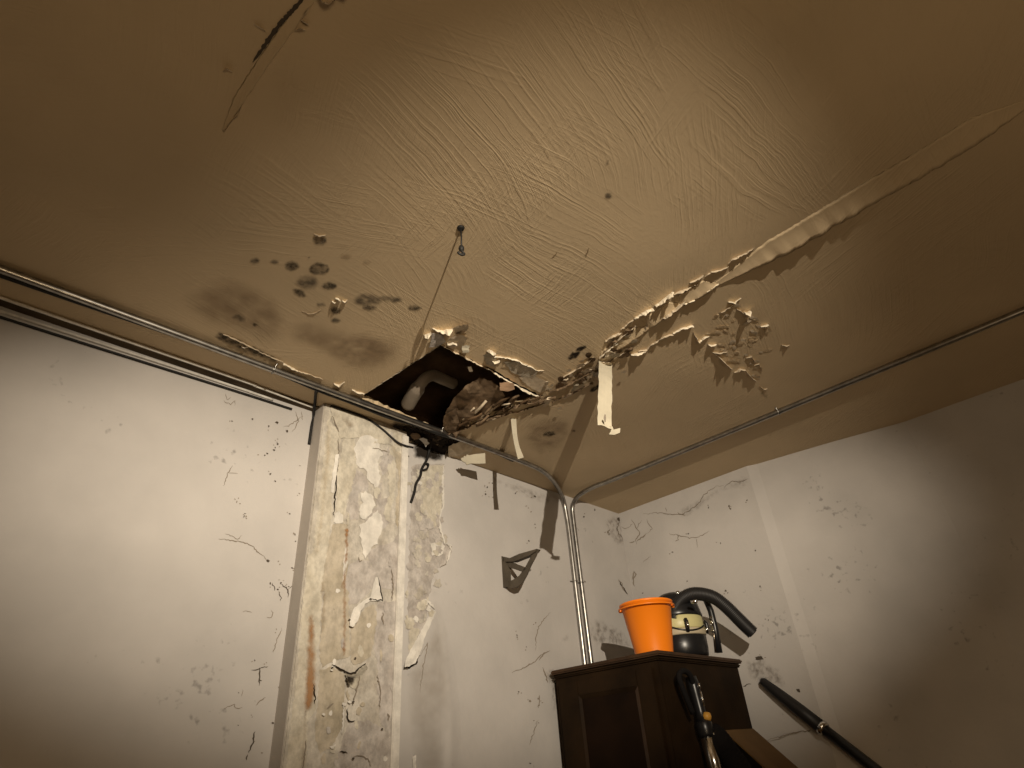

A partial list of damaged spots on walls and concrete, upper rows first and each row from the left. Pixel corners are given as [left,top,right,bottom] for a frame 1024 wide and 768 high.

crack [253,0,303,62]
water stain [272,262,336,296]
water stain [357,296,420,310]
flaking render [217,247,790,407]
crack [220,534,292,709]
rust [306,624,314,708]
peeling [286,407,474,768]
crack [607,479,747,594]